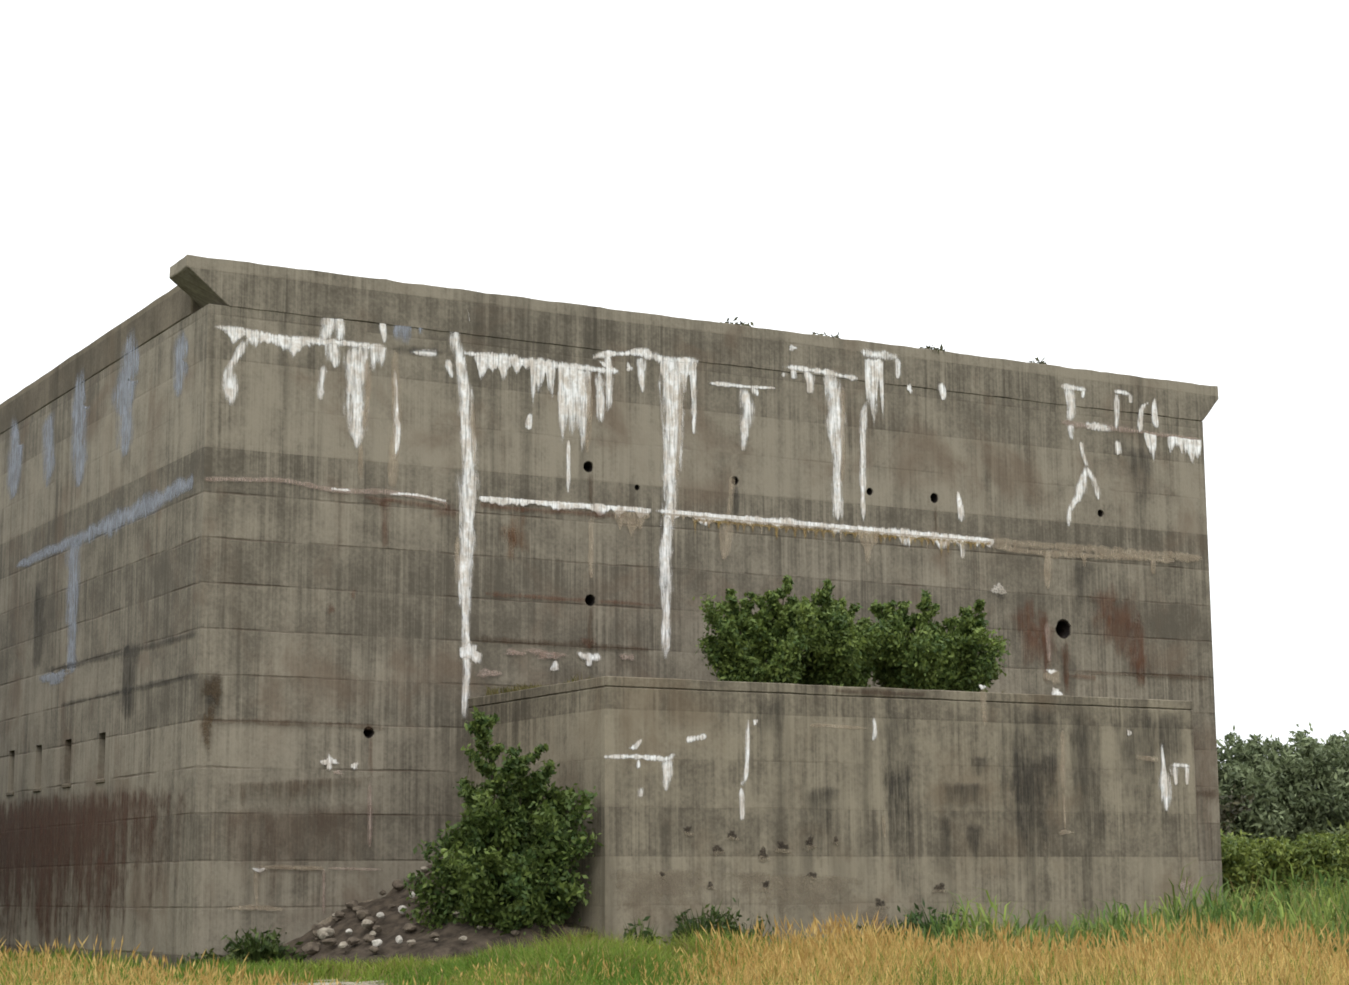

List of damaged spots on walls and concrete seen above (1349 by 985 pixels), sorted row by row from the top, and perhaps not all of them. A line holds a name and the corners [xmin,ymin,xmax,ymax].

water stain [8,425,22,497]
water stain [19,318,1202,716]
water stain [1142,721,1189,810]
water stain [0,792,182,948]